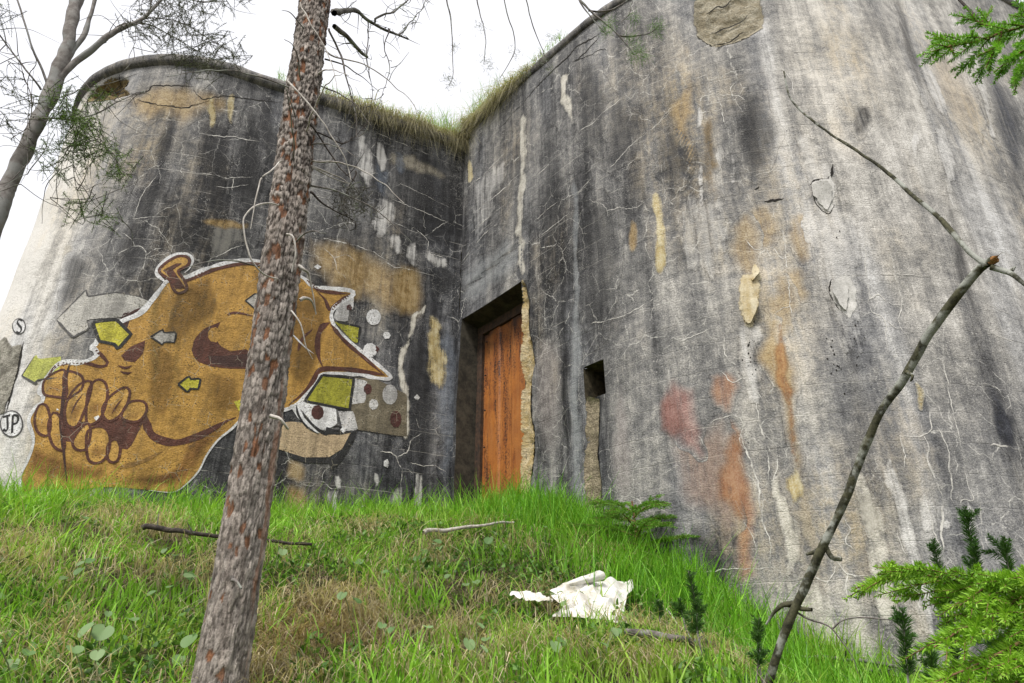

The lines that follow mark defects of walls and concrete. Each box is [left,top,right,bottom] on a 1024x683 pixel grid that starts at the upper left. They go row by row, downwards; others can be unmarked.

spalling [87,75,129,102]
water stain [116,81,278,276]
crack [129,84,281,108]
spalling [693,0,764,48]
peeling [0,337,22,414]
spalling [520,280,535,499]
water stain [305,41,866,514]
corrosion [666,370,760,586]
peeling [738,264,761,327]
corrosion [754,314,806,483]
crack [897,360,984,554]